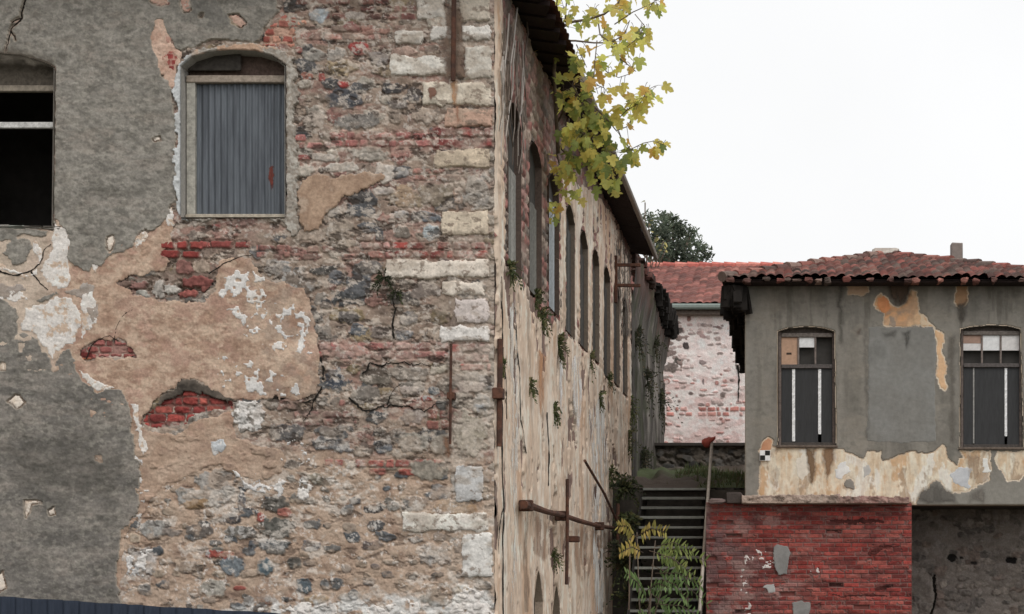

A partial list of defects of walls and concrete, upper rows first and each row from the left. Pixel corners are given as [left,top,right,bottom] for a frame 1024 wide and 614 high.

crack [5,0,26,51]
crack [0,244,51,290]
crack [349,298,443,413]
peeling [848,286,947,390]
peeling [0,207,320,589]
damp [806,448,834,483]
peeling [758,438,1024,505]
peeling [258,602,338,614]
peeling [357,596,420,614]